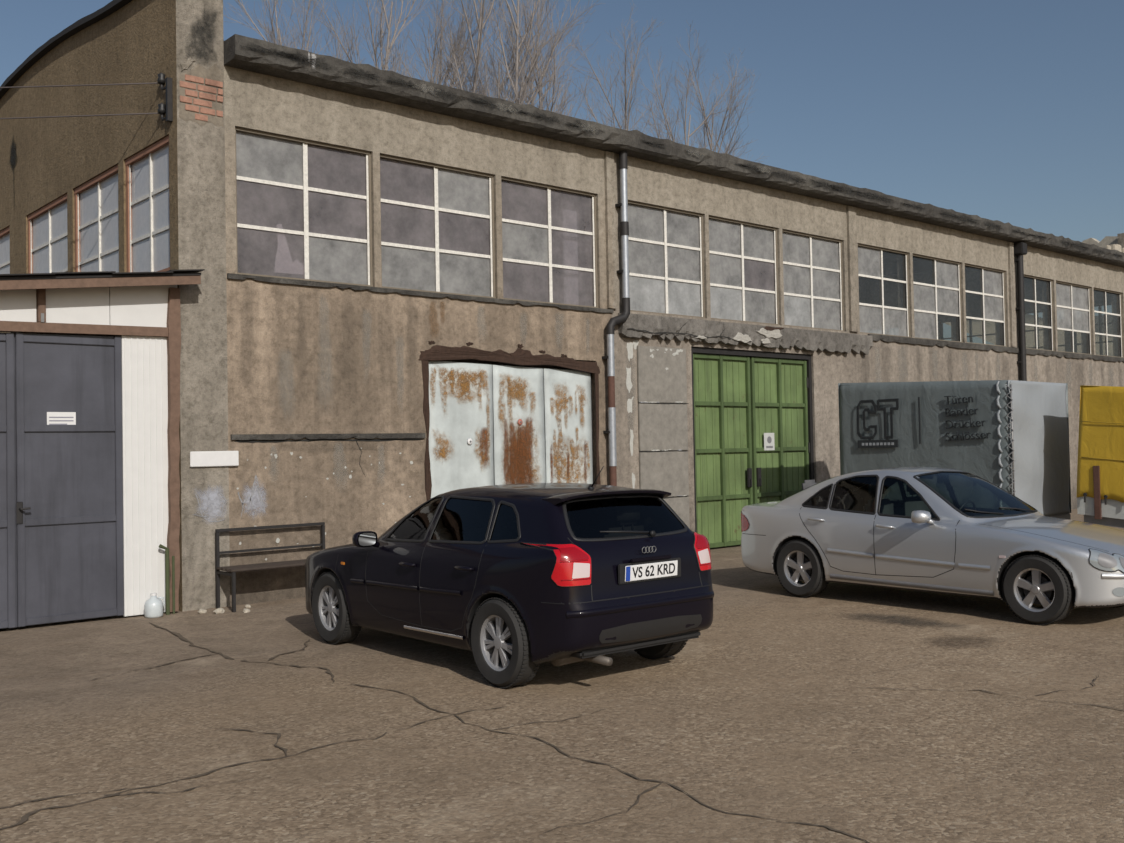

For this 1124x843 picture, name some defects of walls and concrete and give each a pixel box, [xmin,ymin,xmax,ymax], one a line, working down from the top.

flaking render [179,57,224,127]
spalling [732,326,784,344]
peeling [626,340,683,413]
corrosion [430,369,590,484]
crack [0,622,869,843]